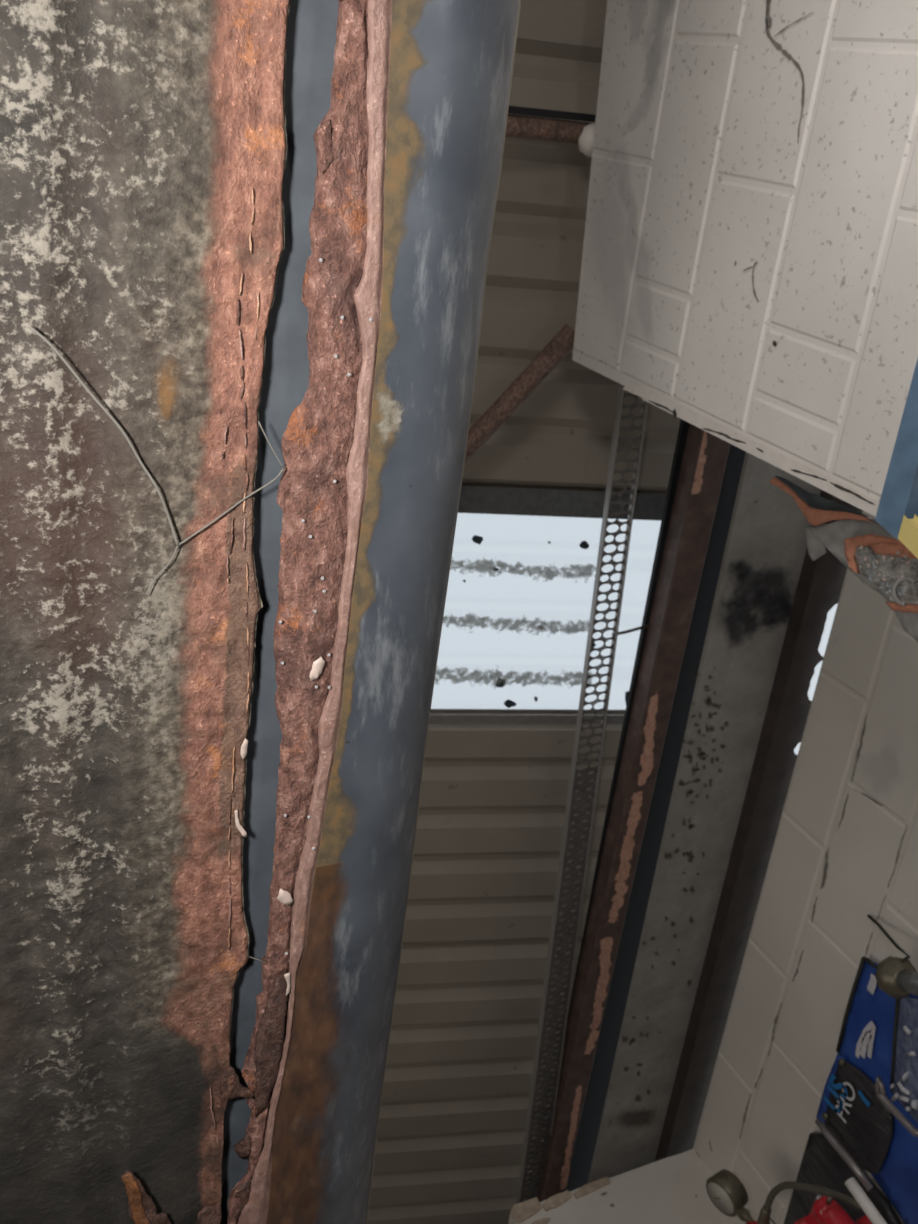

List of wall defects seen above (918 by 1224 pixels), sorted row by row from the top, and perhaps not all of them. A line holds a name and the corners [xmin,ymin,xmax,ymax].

rust [163,0,425,1224]
mould [724,563,792,644]
peeling [584,691,659,1055]
mould [679,674,728,803]
crack [812,718,882,921]
crack [866,826,907,954]
crack [739,951,803,1139]